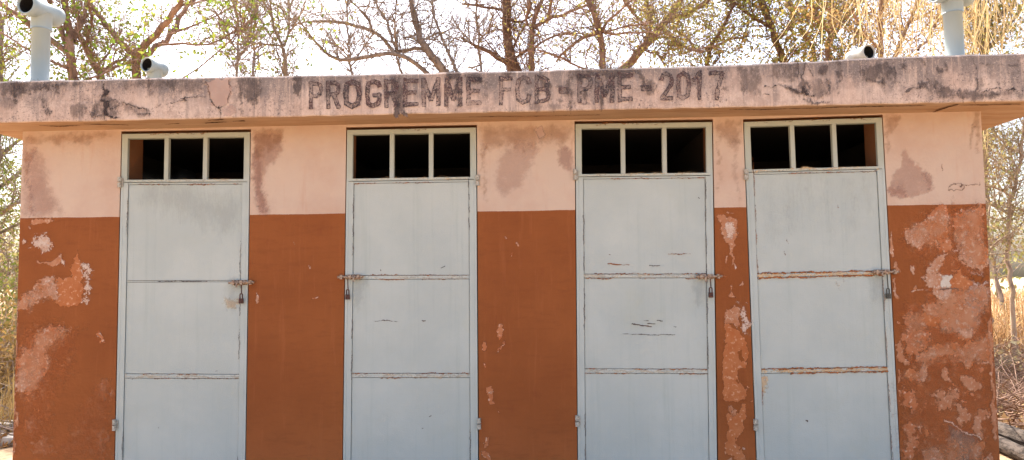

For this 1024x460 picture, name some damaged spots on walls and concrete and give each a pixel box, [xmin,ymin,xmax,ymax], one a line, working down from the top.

spalling [206,78,232,107]
leakage [238,78,262,101]
leakage [292,74,302,96]
leakage [445,70,462,107]
leakage [544,64,657,110]
leakage [905,64,955,98]
rust [757,260,885,311]
peeling [12,217,94,459]
peeling [482,323,505,368]
peeling [716,212,754,460]
peeling [889,203,998,460]
rust [761,340,891,412]